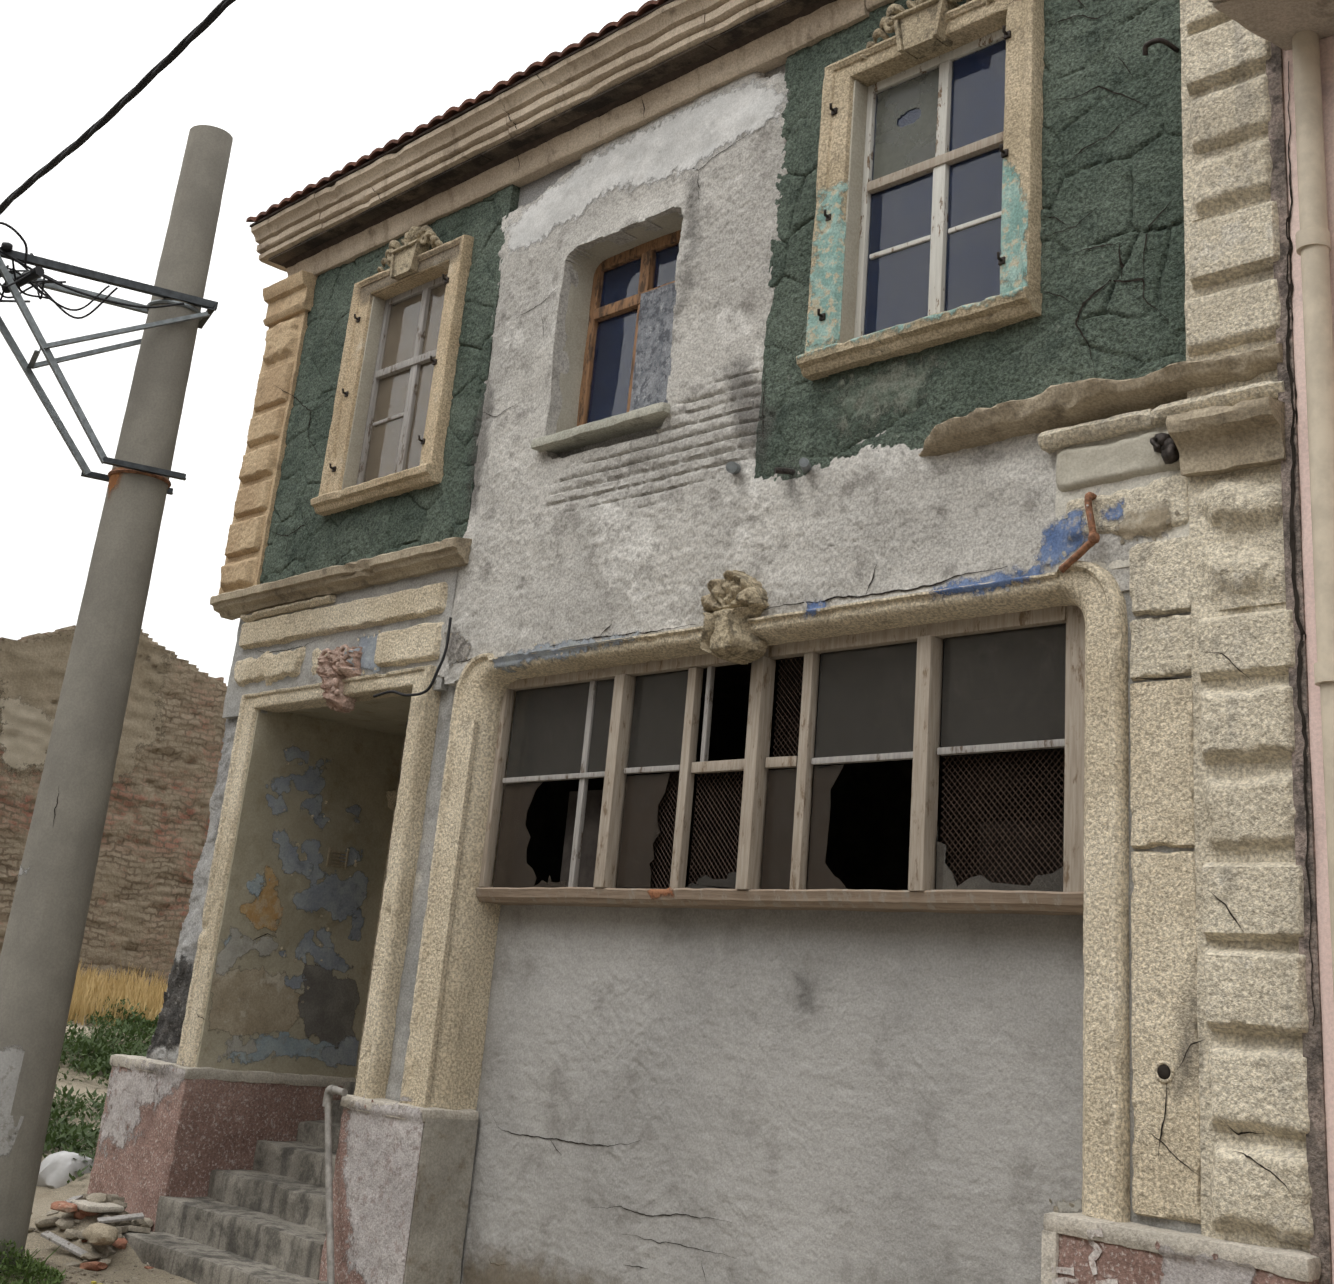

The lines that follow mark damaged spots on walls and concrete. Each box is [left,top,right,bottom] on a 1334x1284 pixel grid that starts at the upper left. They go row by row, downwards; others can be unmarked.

crack [1048,0,1122,27]
crack [1044,53,1166,179]
peeling [797,159,1028,360]
crack [1030,192,1182,373]
peeling [493,631,639,673]
spalling [209,766,369,1068]
crack [495,1121,640,1153]
crack [1146,1039,1205,1178]
crack [593,1206,731,1276]